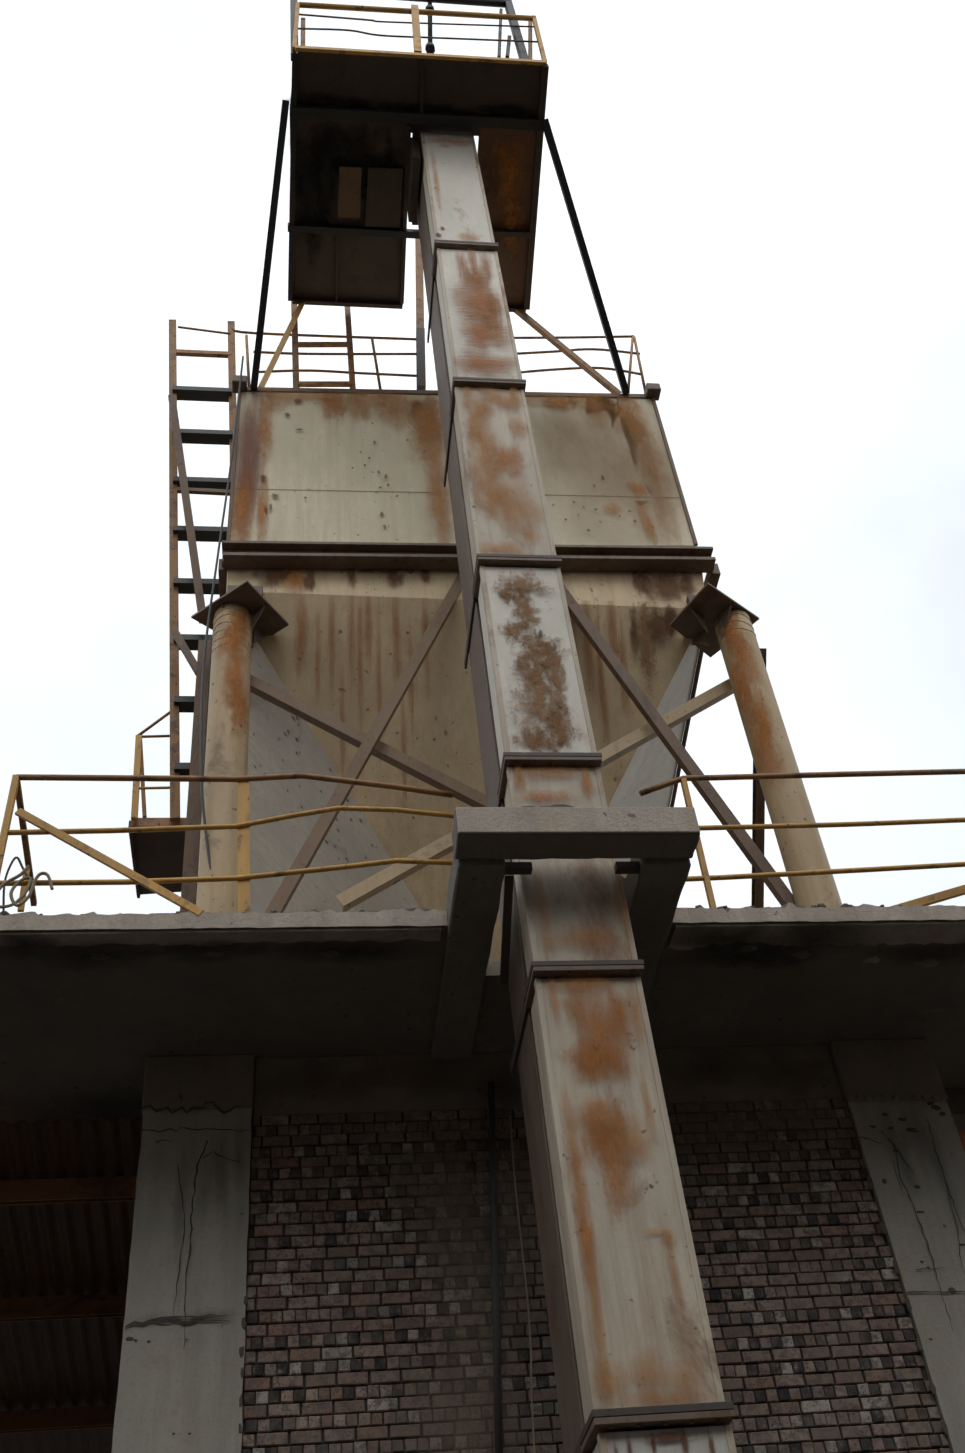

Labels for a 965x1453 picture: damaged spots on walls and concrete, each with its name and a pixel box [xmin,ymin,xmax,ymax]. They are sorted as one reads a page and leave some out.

rust [234,399,303,533]
rust [493,571,694,752]
rust [727,619,782,773]
crack [125,1101,252,1346]
rust [577,1188,601,1332]
crack [859,1119,965,1330]